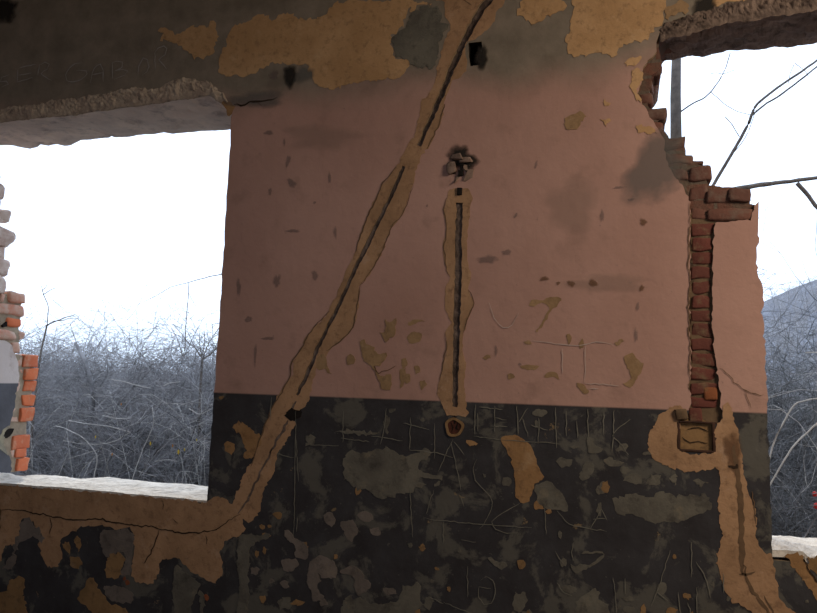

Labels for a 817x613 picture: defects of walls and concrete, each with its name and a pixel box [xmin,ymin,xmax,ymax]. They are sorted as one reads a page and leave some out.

peeling [158,0,449,90]
peeling [517,0,817,58]
flaking render [623,56,753,423]
flaking render [0,176,38,472]
crack [0,500,240,563]
flaking render [0,407,296,613]
peeling [501,435,568,514]